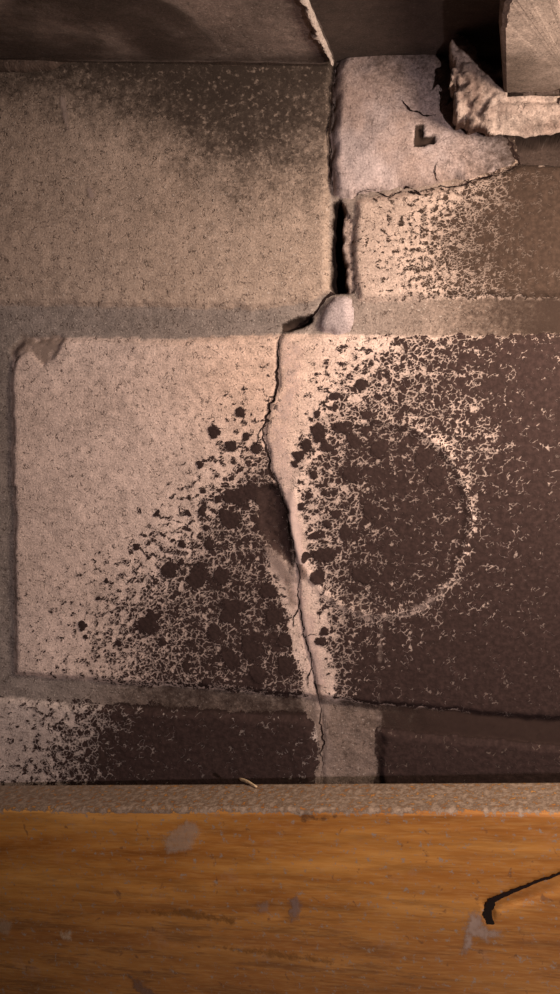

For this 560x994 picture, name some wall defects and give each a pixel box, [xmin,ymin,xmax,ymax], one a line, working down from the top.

leakage [0,0,253,65]
leakage [15,134,560,720]
crack [256,292,335,782]
leakage [0,696,330,785]
leakage [374,726,560,784]